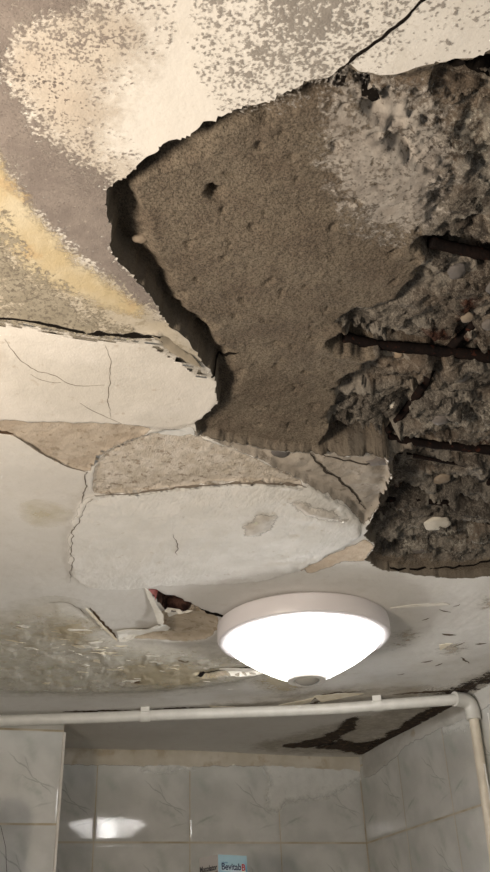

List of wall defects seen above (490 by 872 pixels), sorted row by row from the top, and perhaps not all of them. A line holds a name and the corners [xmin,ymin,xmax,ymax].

crack [344,0,425,67]
leakage [0,0,200,362]
spalling [0,0,490,579]
peeling [0,588,295,692]
peeling [280,691,364,705]
leakage [283,706,452,755]
leakage [446,672,490,694]